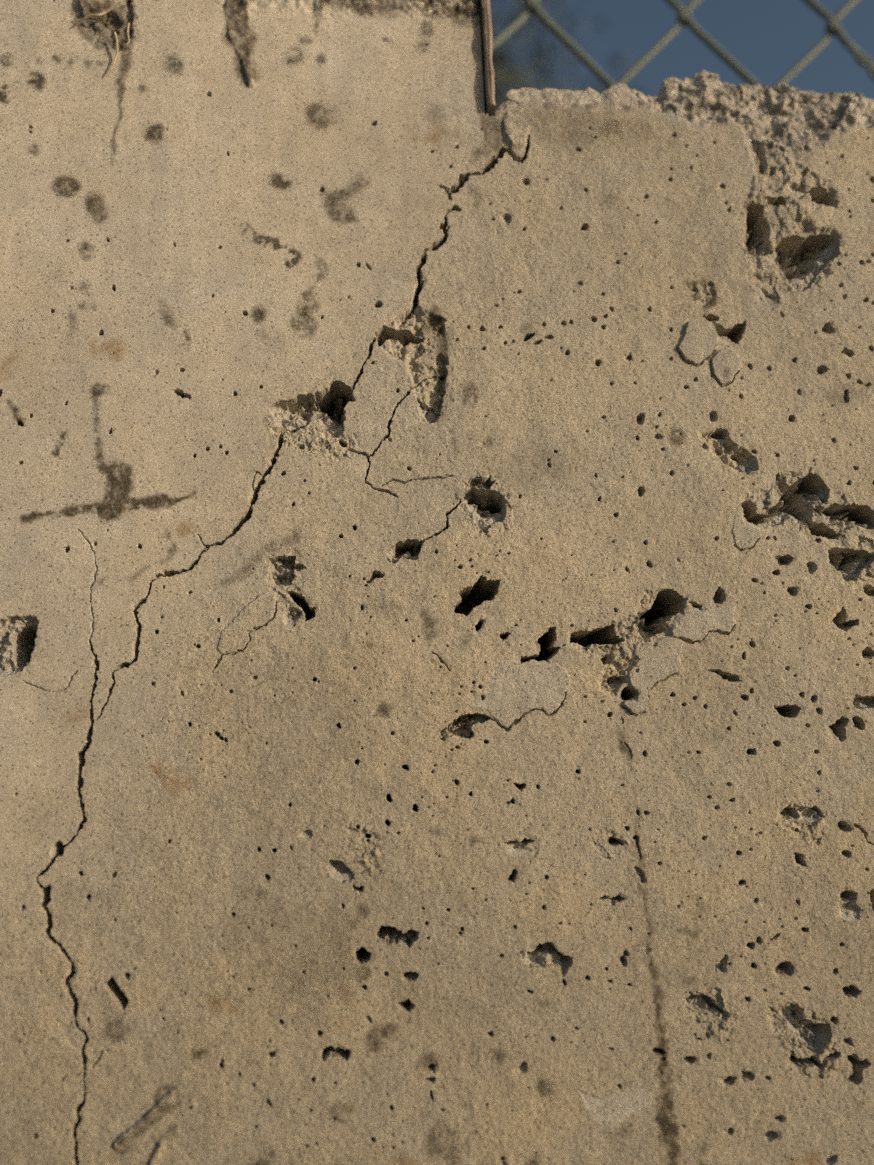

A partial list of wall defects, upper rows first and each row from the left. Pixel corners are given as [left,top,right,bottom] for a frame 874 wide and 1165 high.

crack [406,133,531,319]
spalling [488,69,874,318]
crack [352,337,376,392]
spalling [374,305,450,425]
crack [357,387,453,497]
spalling [701,411,760,476]
crack [422,506,456,542]
spalling [732,468,874,600]
peeling [470,657,571,727]
crack [491,691,567,732]
spalling [568,587,736,714]
crack [20,441,280,1165]